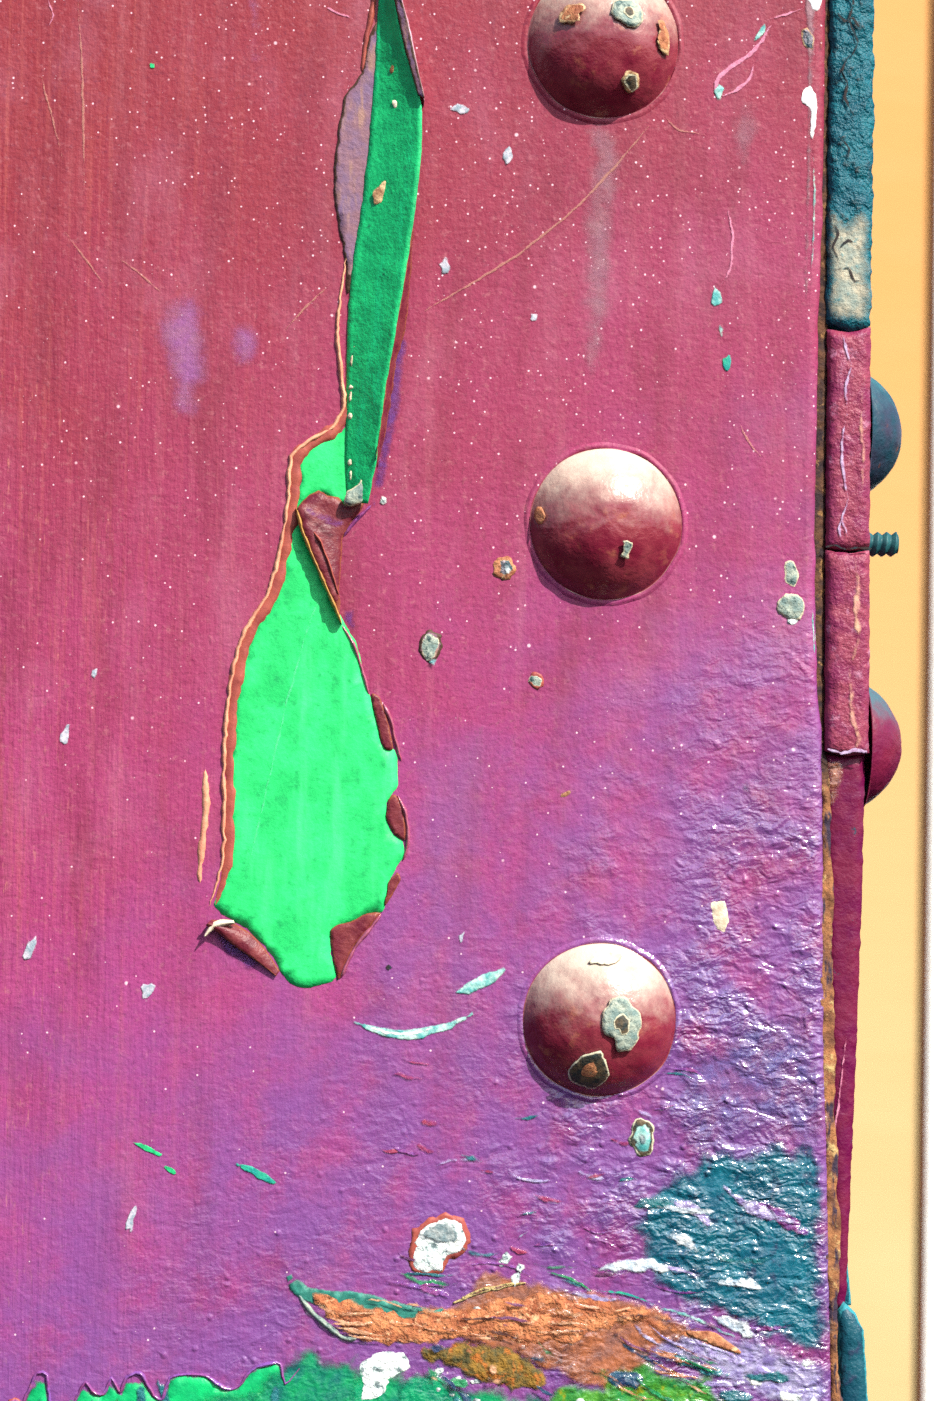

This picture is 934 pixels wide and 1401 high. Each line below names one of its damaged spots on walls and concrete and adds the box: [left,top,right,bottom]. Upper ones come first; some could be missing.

peeling [197,0,425,988]
peeling [408,1212,471,1277]
rust [287,1264,741,1401]
peeling [8,1370,52,1401]
peeling [74,1361,300,1401]
peeling [359,1352,410,1400]